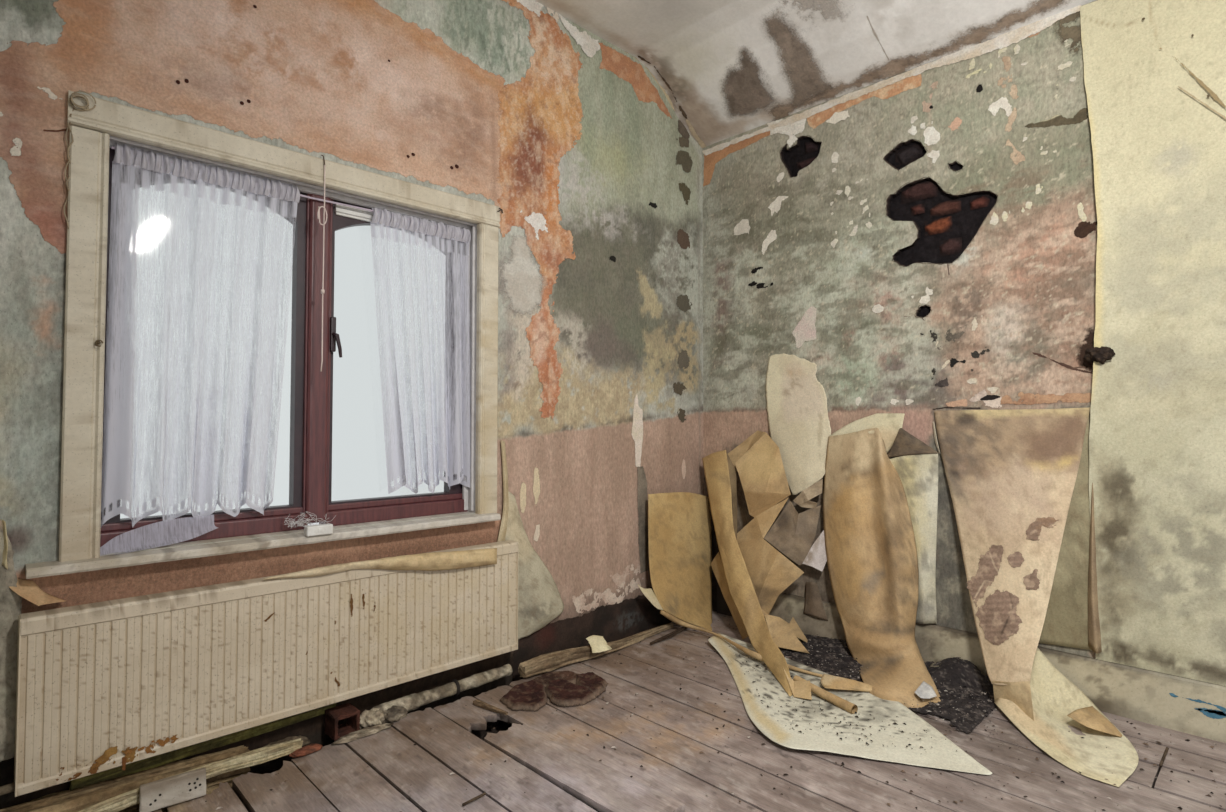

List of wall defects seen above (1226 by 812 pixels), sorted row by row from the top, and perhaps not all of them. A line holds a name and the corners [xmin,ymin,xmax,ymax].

peeling [0,0,672,419]
spalling [702,5,1081,267]